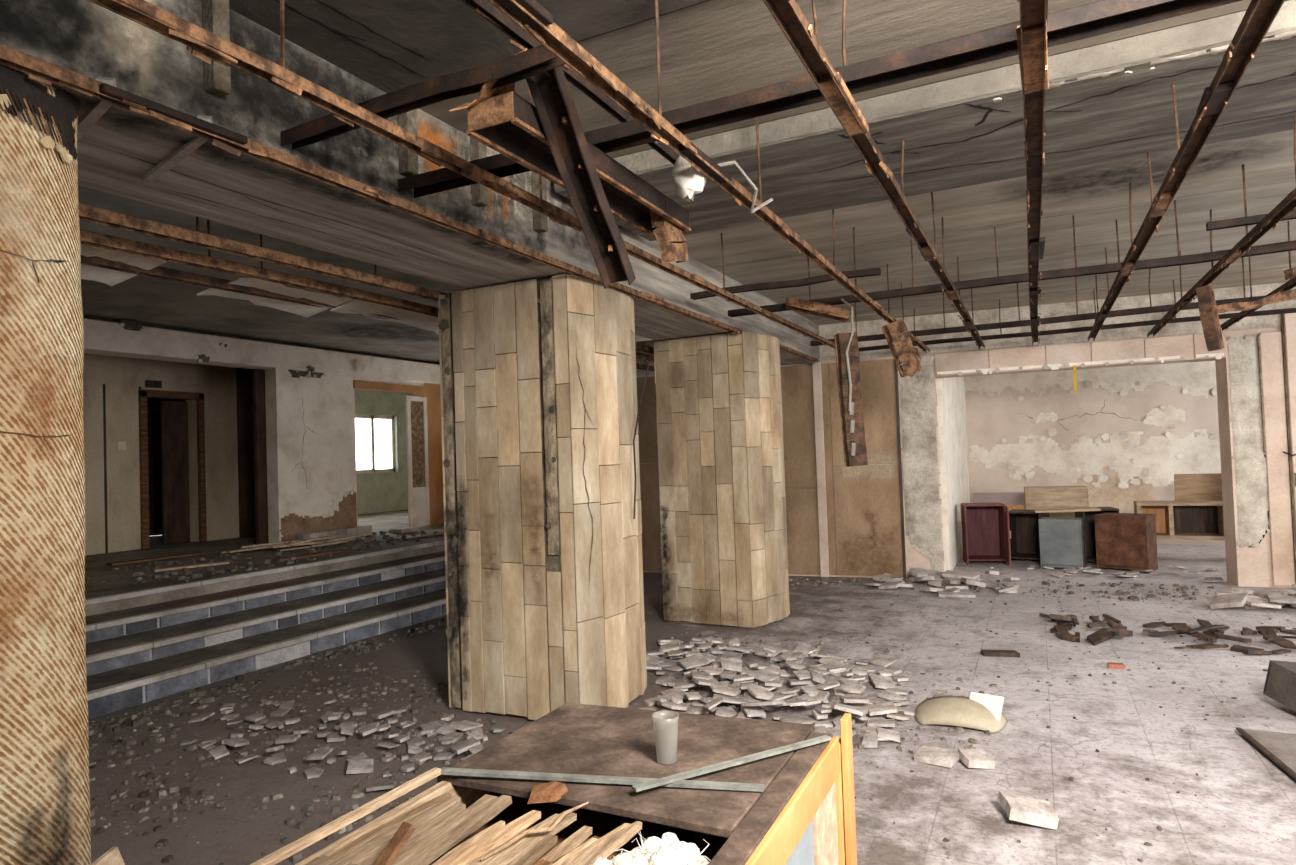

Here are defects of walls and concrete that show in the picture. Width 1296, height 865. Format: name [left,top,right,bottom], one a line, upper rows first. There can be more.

leakage [0,0,87,53]
leakage [229,11,378,104]
spalling [0,65,80,164]
leakage [231,66,332,127]
leakage [324,128,376,168]
rust [419,128,449,145]
peeling [279,487,357,542]